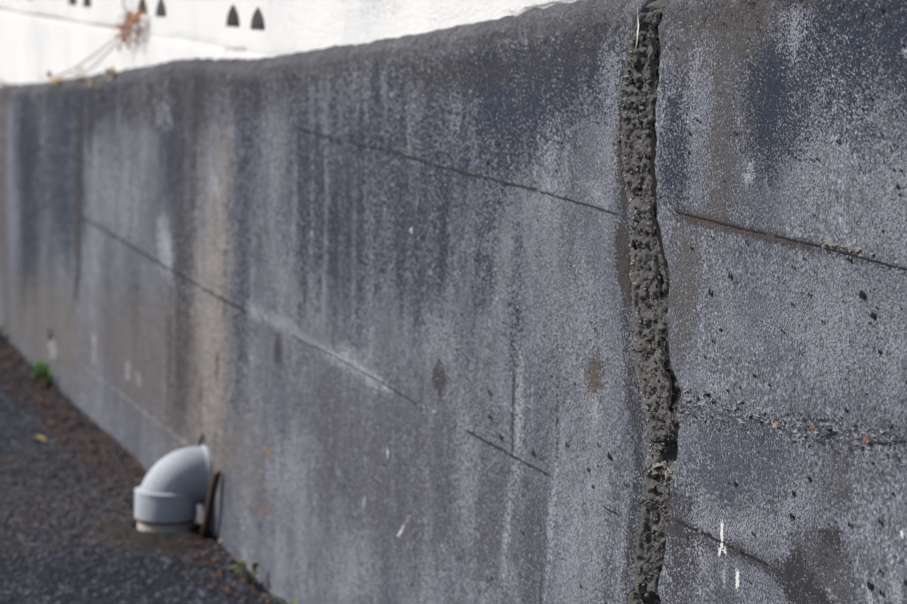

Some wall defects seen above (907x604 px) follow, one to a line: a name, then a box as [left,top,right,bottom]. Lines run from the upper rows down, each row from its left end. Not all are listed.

water stain [0,23,646,604]
crack [291,0,907,604]
water stain [660,409,866,604]